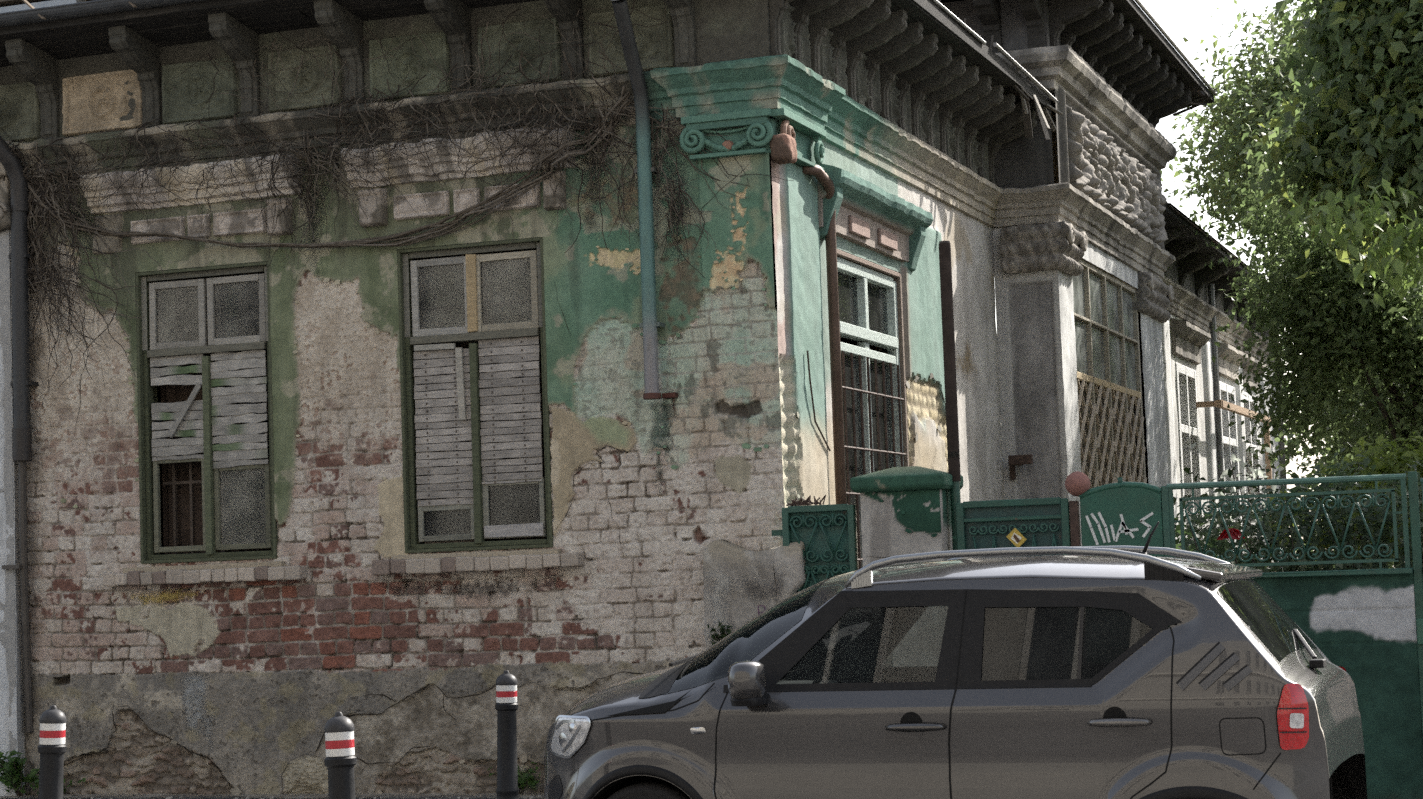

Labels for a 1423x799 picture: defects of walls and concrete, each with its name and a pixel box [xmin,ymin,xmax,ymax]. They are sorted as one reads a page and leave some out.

peeling [568,173,641,276]
flaking render [26,240,140,522]
flaking render [280,275,403,538]
flaking render [573,186,805,508]
peeling [860,493,957,567]
spalling [63,709,242,796]
flaking render [169,558,636,796]
crack [281,672,646,788]
peeling [892,606,945,667]